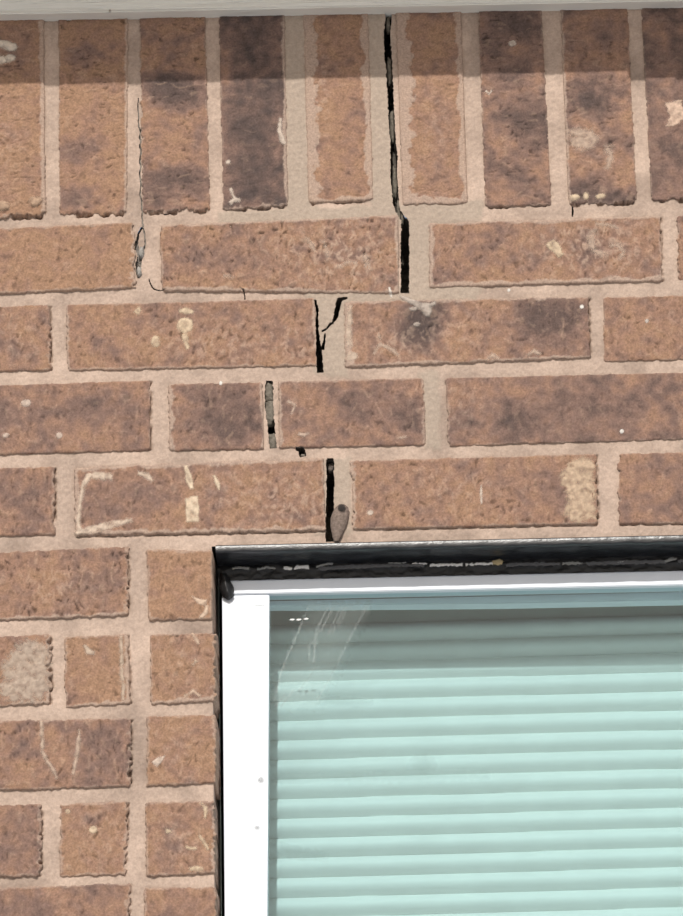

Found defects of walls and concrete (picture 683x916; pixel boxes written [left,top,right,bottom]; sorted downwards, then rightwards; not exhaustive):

crack [314,298,347,373]
crack [264,382,335,542]